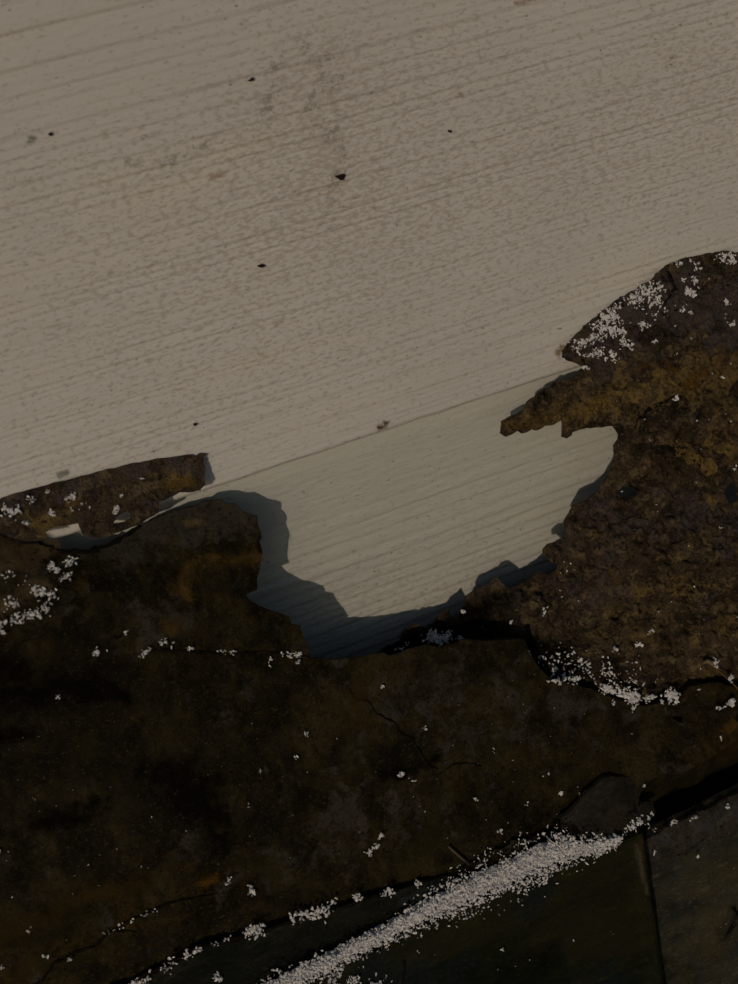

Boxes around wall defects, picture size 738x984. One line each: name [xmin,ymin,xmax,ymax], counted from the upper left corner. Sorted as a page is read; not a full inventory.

corrosion [377,251,738,705]
corrosion [0,538,60,615]
crack [35,893,217,984]
crack [127,881,429,984]
leakage [398,878,460,909]